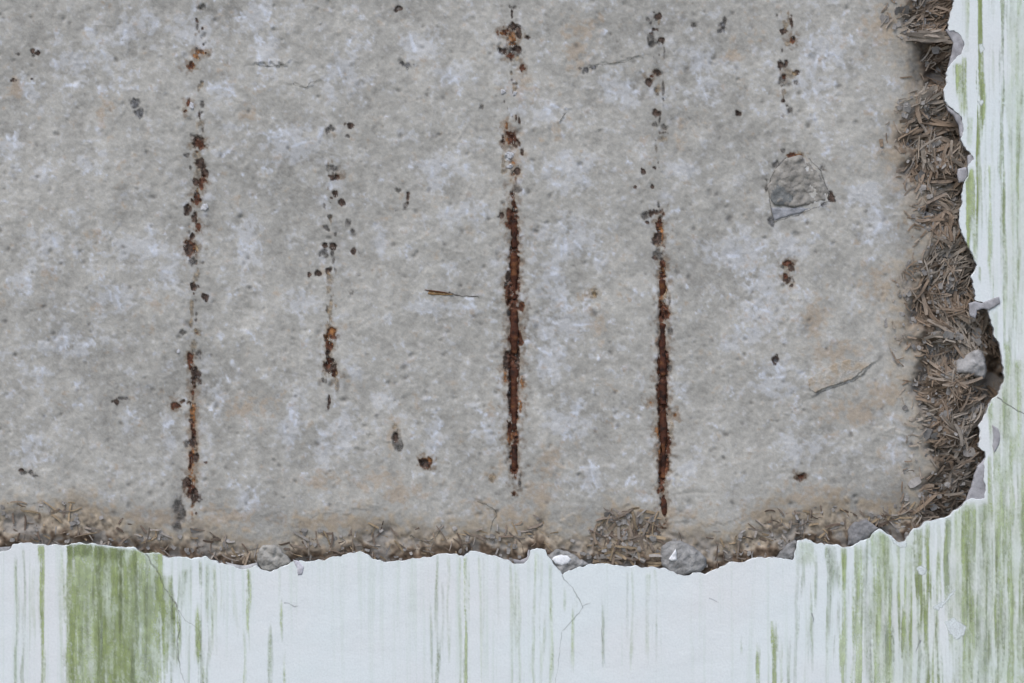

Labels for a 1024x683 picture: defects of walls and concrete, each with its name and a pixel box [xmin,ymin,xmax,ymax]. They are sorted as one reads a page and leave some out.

peeling [945,29,964,67]
rust [183,98,209,265]
spalling [765,150,835,227]
leakage [955,0,1005,261]
rust [171,349,207,530]
rust [498,115,525,496]
rust [642,203,677,529]
peeling [965,425,1000,501]
peeling [968,297,1000,318]
leakage [66,545,180,683]
leakage [833,536,931,683]
leakage [944,512,983,593]